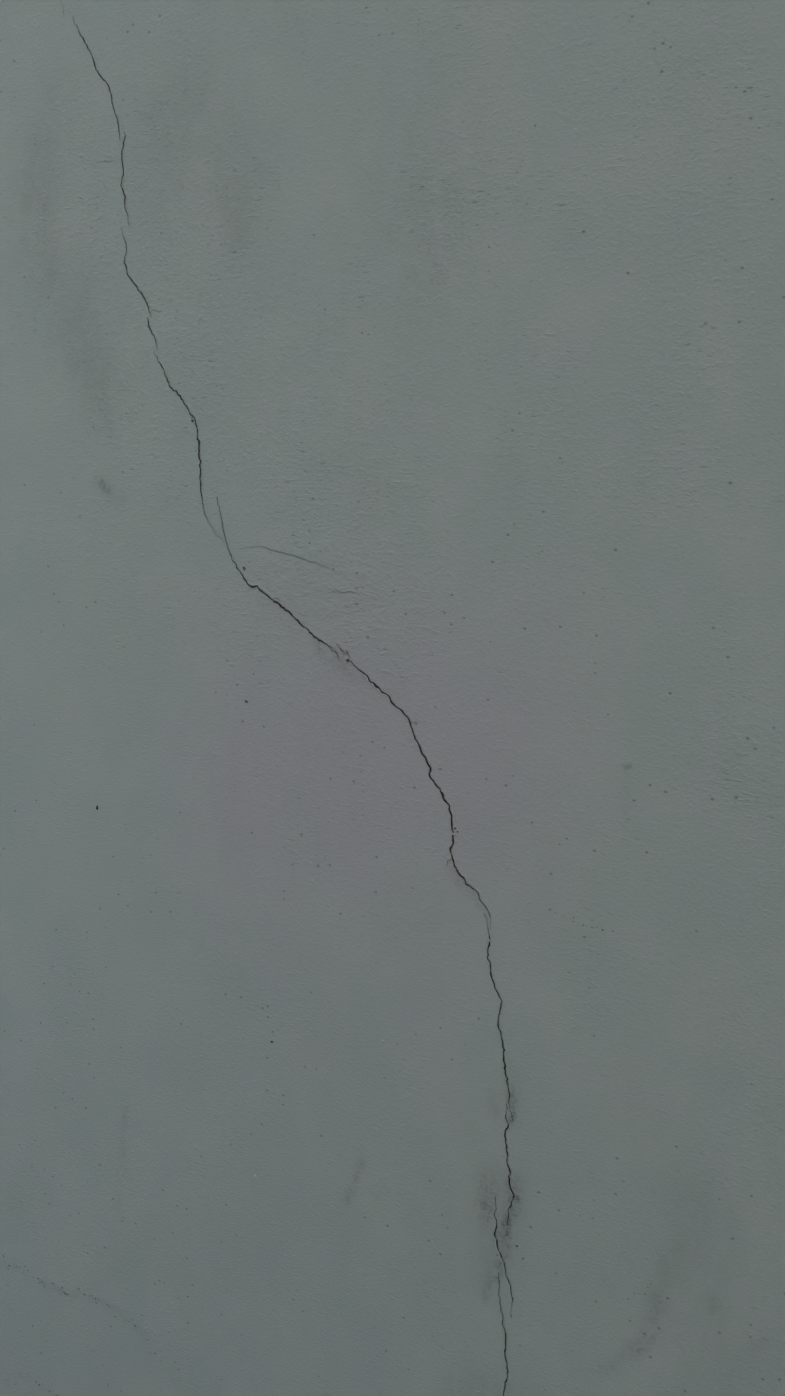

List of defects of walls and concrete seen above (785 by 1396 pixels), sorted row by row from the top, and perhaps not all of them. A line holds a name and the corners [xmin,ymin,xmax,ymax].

crack [62,5,515,1396]